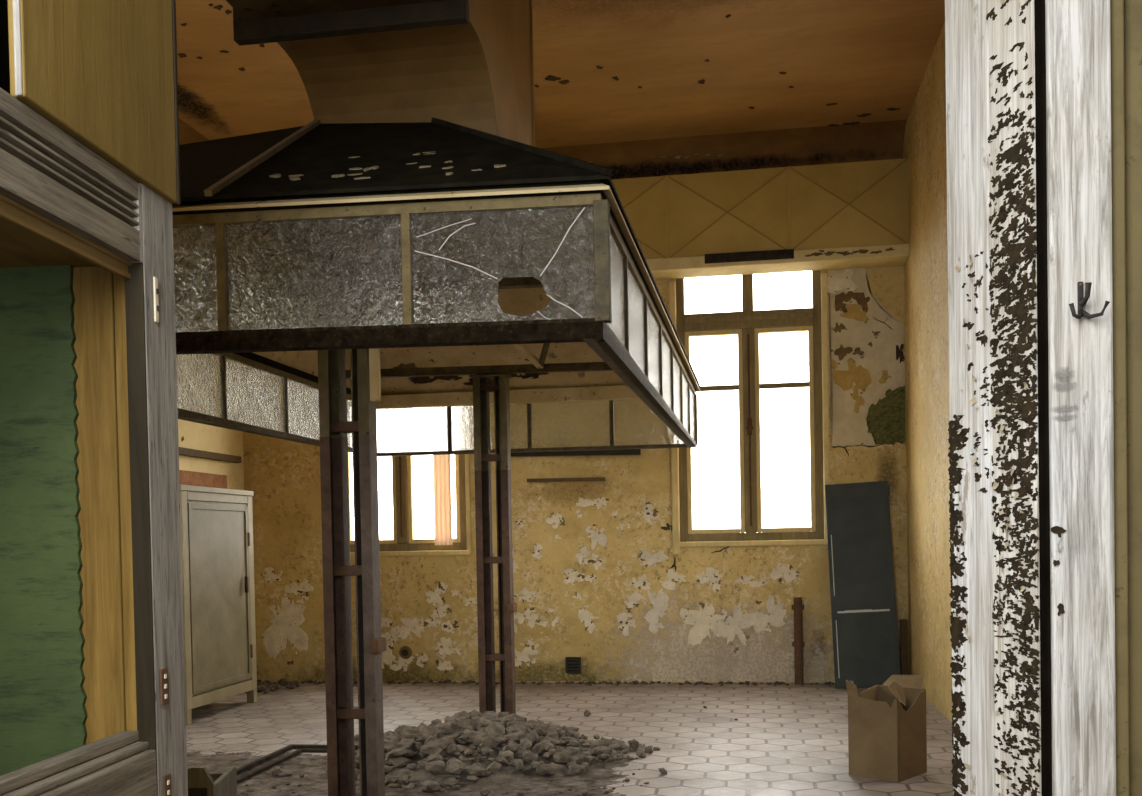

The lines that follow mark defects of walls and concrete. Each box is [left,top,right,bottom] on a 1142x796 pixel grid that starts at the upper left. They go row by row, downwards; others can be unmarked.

peeling [986,0,1031,26]
flaking render [805,247,905,448]
peeling [947,42,1066,796]
peeling [260,567,314,665]
peeling [381,581,477,674]
peeling [514,587,559,669]
peeling [546,497,631,633]
peeling [642,500,672,532]
peeling [616,549,799,654]